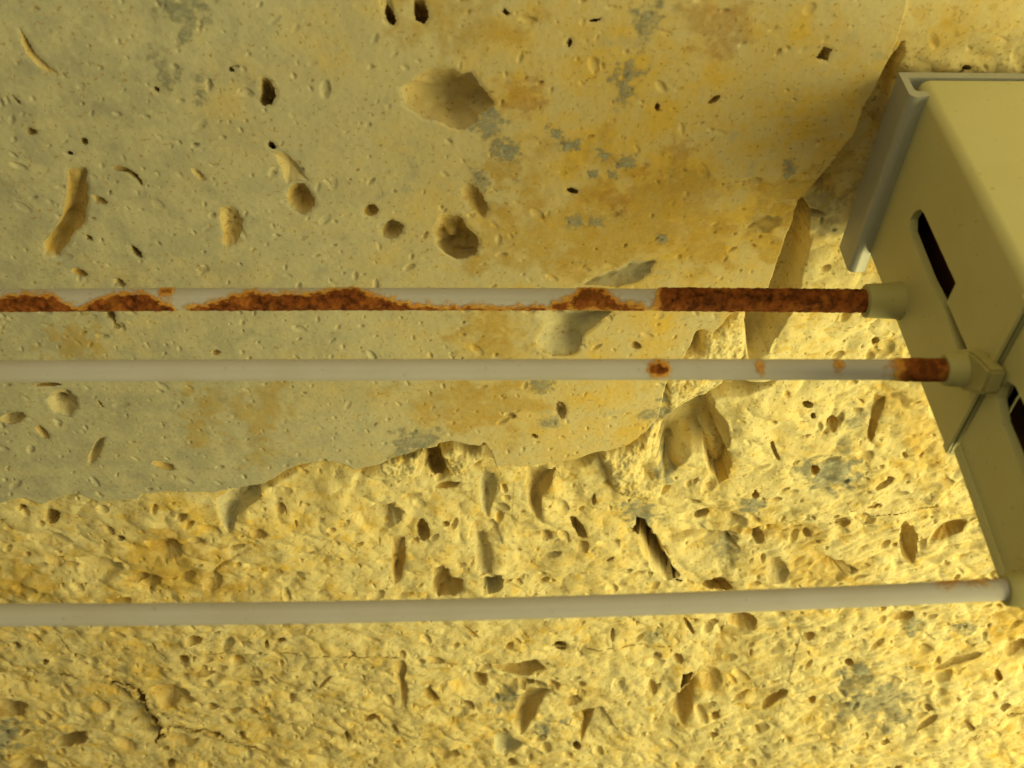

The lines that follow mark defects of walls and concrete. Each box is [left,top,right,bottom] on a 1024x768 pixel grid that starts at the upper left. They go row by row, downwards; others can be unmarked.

spalling [768,0,1024,289]
spalling [217,203,246,250]
spalling [362,203,406,240]
spalling [432,182,492,262]
spalling [579,258,659,288]
corrosion [0,286,869,313]
spalling [532,309,615,359]
spalling [682,311,911,359]
corrosion [647,358,671,378]
corrosion [890,357,949,382]
spalling [0,380,998,603]
spalling [0,601,1024,768]